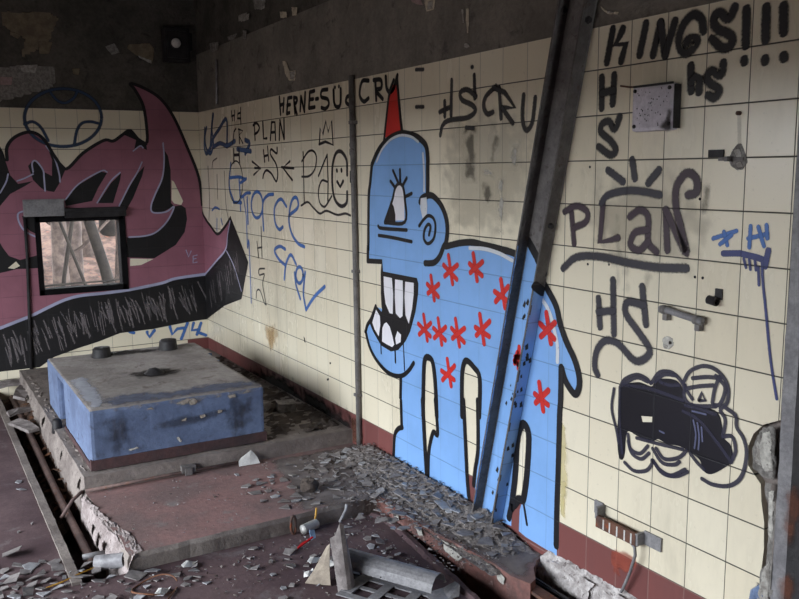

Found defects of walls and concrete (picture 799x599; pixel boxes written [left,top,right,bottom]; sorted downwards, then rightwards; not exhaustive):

peeling [0,11,58,102]
spalling [19,371,143,579]
spalling [749,426,776,599]